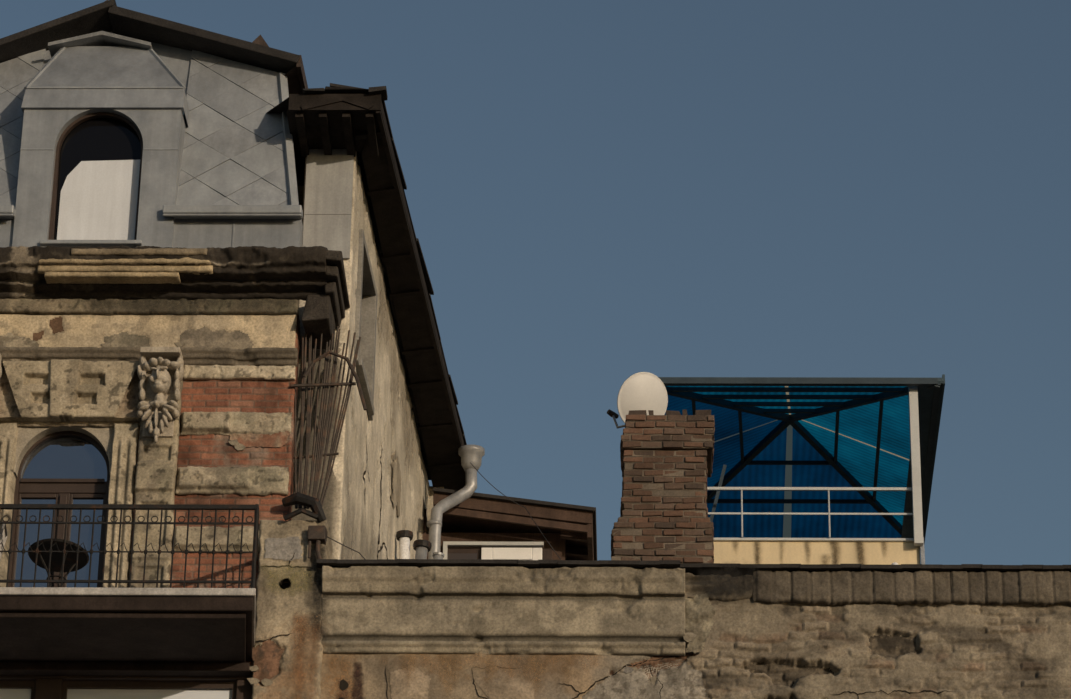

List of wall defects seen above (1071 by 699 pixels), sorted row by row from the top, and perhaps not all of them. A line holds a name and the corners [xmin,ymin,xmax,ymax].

peeling [0,316,64,361]
peeling [175,326,254,350]
crack [363,417,388,559]
spalling [247,638,285,686]
crack [471,666,514,699]
crack [559,656,673,699]